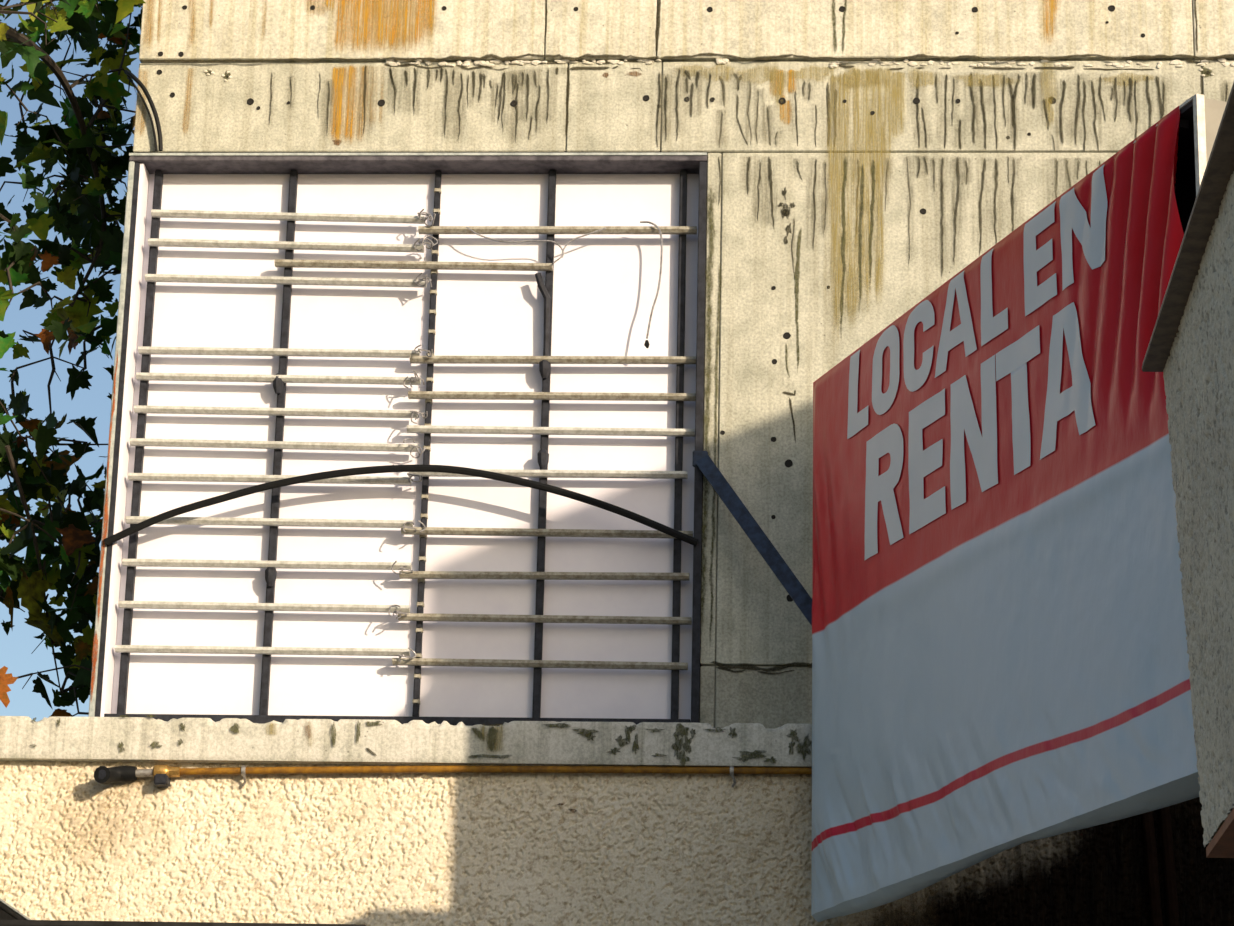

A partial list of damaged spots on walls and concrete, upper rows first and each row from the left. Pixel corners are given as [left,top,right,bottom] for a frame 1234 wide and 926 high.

rust [147,0,160,43]
rust [310,0,434,47]
rust [1044,0,1056,37]
rust [332,66,371,145]
damp [389,68,558,141]
rust [775,70,794,124]
damp [656,63,1165,465]
damp [356,721,383,743]
damp [469,725,509,758]
damp [608,723,737,766]
damp [733,730,812,763]
damp [873,797,1234,926]